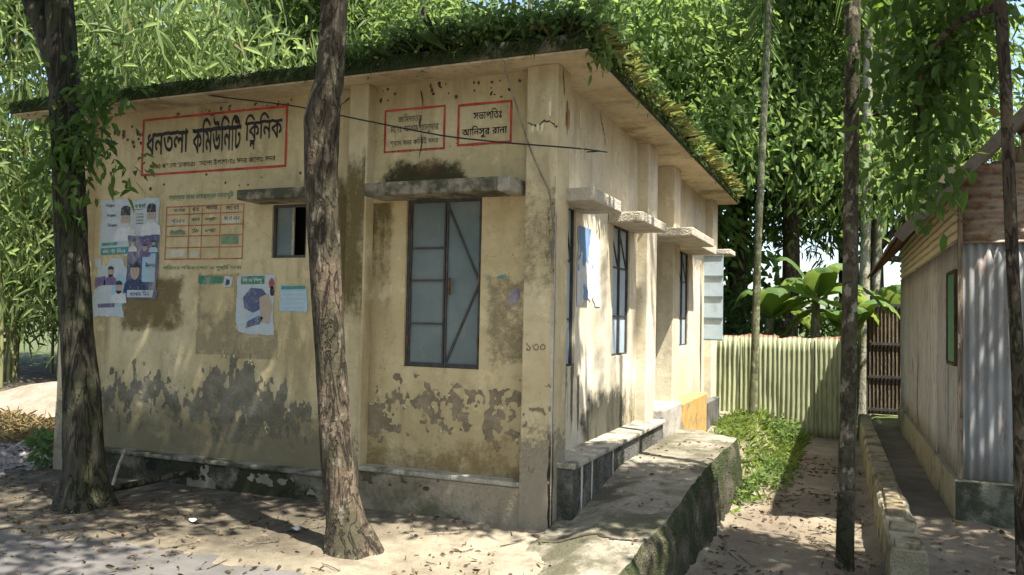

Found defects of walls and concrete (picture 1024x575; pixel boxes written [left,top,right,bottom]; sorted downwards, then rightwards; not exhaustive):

damp [383,81,466,182]
damp [122,279,181,331]
flaking render [100,349,312,444]
flaking render [368,210,558,527]
flaking render [187,464,216,489]
flaking render [247,473,294,487]